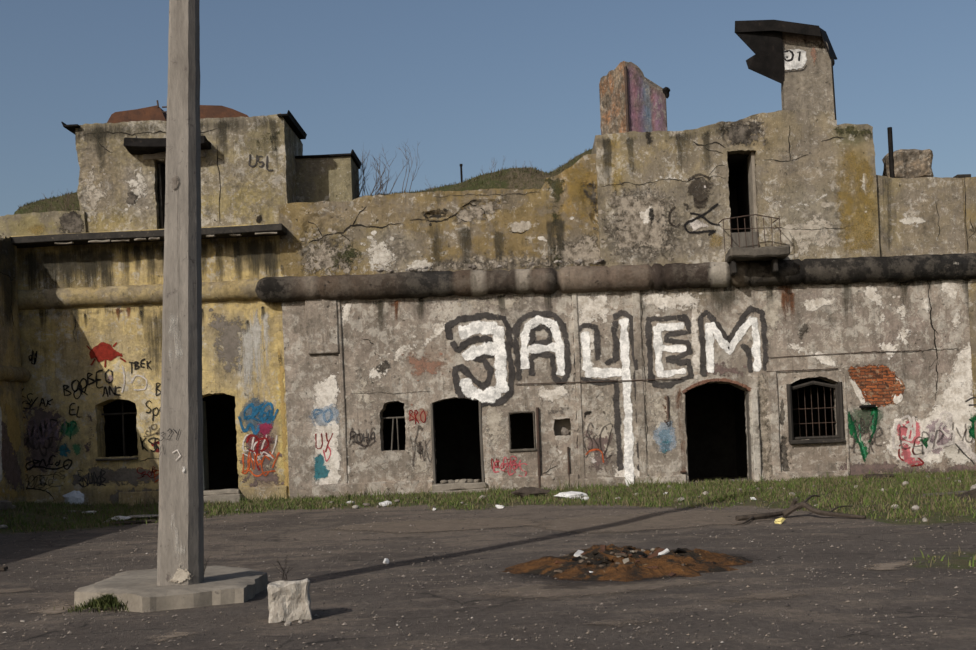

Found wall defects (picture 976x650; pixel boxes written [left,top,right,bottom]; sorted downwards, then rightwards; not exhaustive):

crack [79,131,166,153]
crack [769,126,843,162]
peeling [81,165,110,222]
spalling [126,188,138,205]
crack [201,129,222,225]
crack [309,192,540,243]
damp [0,237,164,320]
damp [201,238,281,276]
crack [849,283,968,401]
peeling [757,280,976,481]